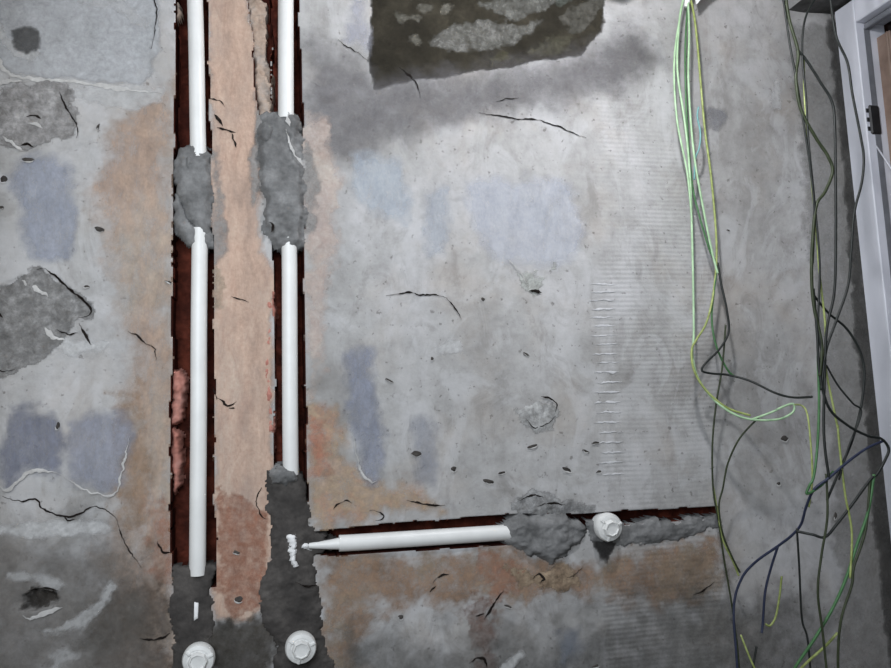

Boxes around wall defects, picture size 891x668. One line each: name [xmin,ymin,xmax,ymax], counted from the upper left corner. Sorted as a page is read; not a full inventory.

peeling [368,0,605,89]
spalling [0,79,78,151]
crack [486,98,586,138]
spalling [0,266,95,378]
crack [386,291,461,318]
spalling [516,396,560,433]
crack [3,496,141,567]
spalling [22,587,62,620]